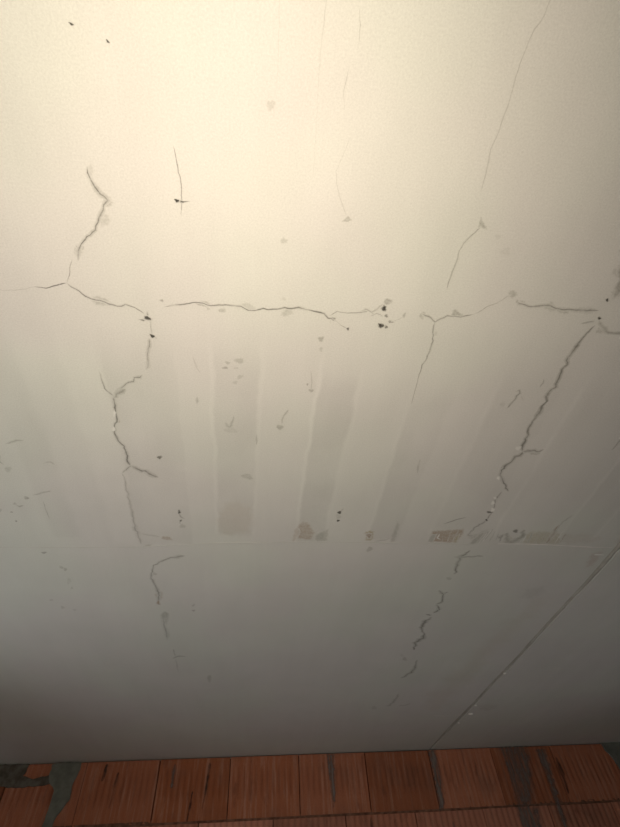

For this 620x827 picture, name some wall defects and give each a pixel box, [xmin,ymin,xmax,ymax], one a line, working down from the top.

crack [481,0,551,191]
crack [2,163,145,314]
crack [165,297,374,331]
crack [447,216,512,290]
crack [99,338,158,544]
crack [400,289,620,678]
crack [149,554,185,605]